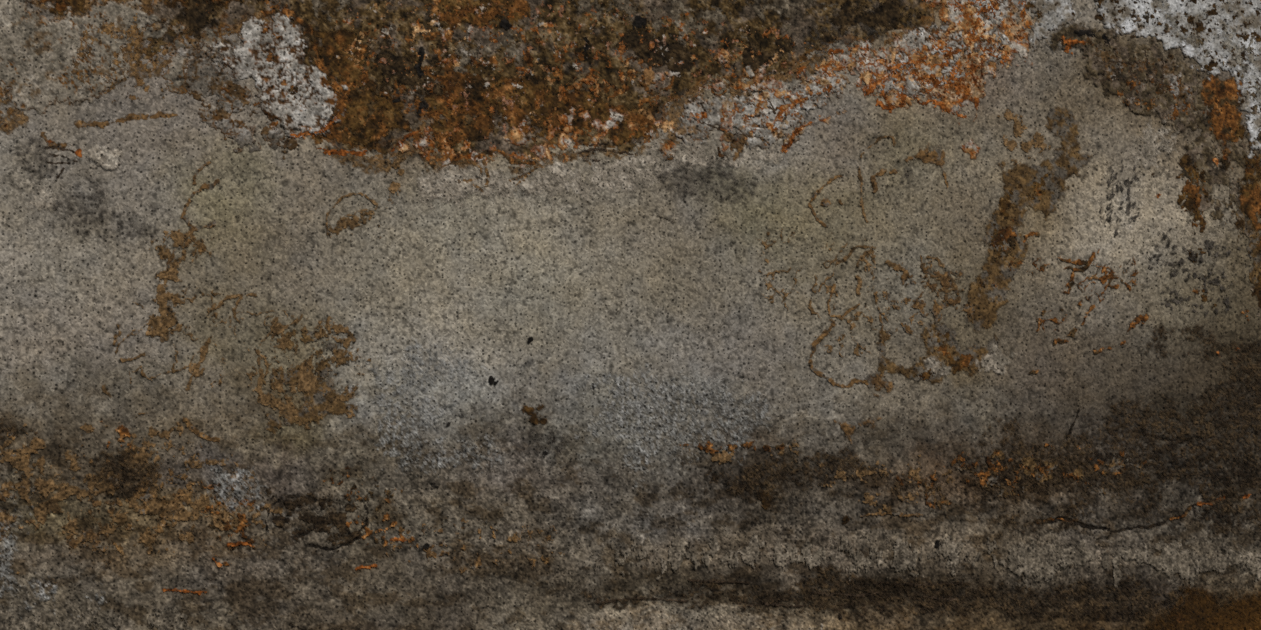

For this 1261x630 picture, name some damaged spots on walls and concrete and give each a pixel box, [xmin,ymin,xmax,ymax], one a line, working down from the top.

rust [0,90,29,135]
rust [32,0,1039,174]
rust [967,106,1146,346]
leakage [1134,120,1179,169]
rust [1176,67,1261,321]
rust [253,316,371,434]
leakage [529,363,768,487]
rust [1093,313,1150,354]
leakage [0,515,17,596]
rust [0,413,283,568]
leakage [210,466,260,510]
rust [324,466,562,574]